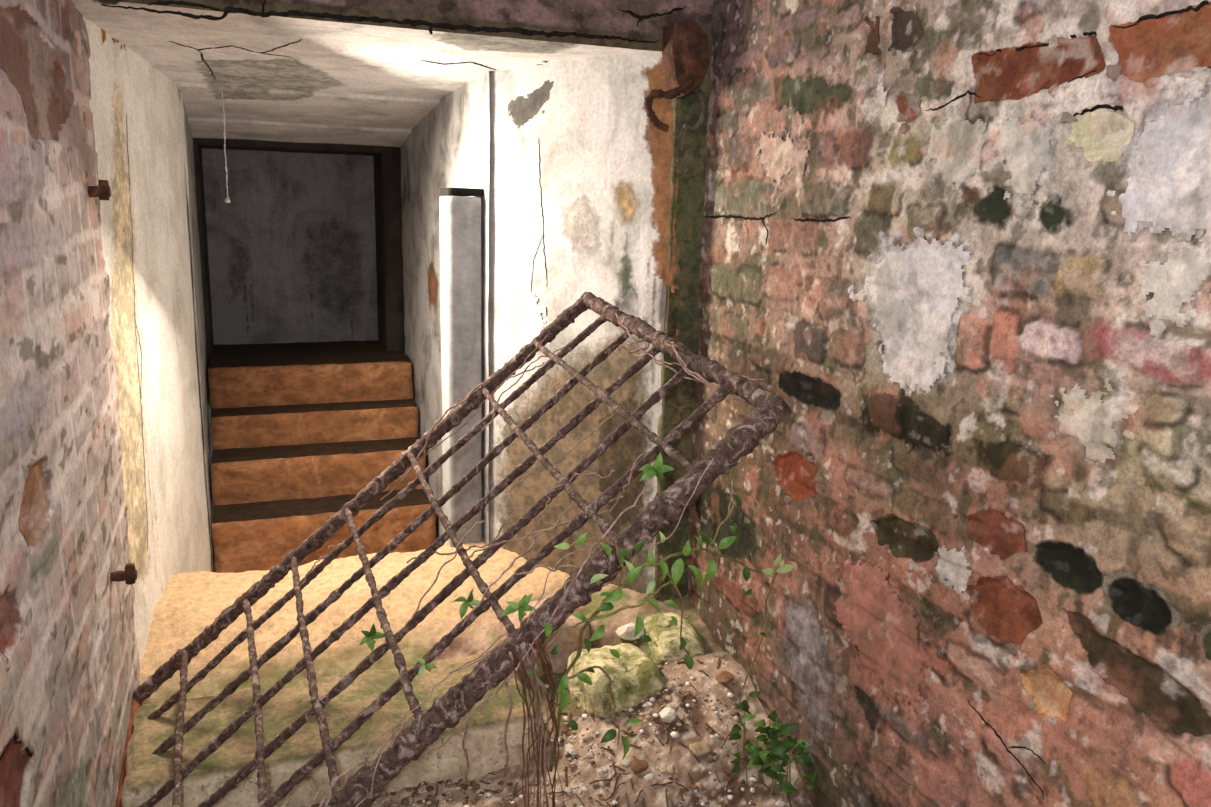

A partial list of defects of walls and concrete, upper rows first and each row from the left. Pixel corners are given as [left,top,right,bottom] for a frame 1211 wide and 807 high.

spalling [0,4,77,150]
crack [101,0,687,79]
peeling [507,80,553,128]
corrosion [615,58,678,314]
peeling [860,0,1211,336]
peeling [848,227,976,396]
crack [967,699,1046,800]